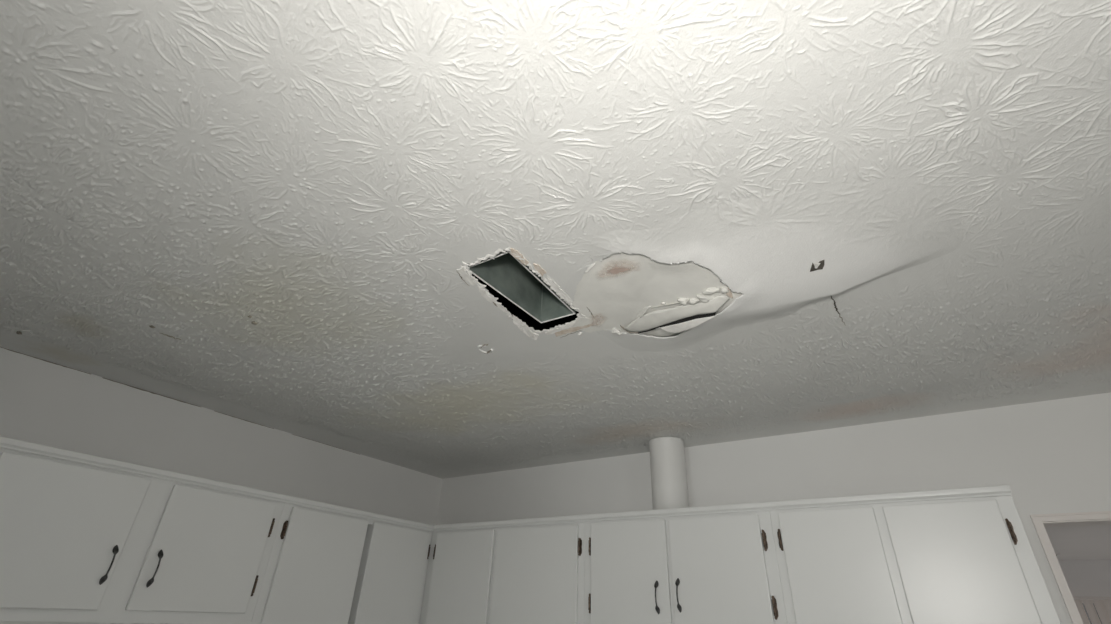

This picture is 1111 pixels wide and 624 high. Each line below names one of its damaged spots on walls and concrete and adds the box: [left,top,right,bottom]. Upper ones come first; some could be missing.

peeling [457,248,742,341]